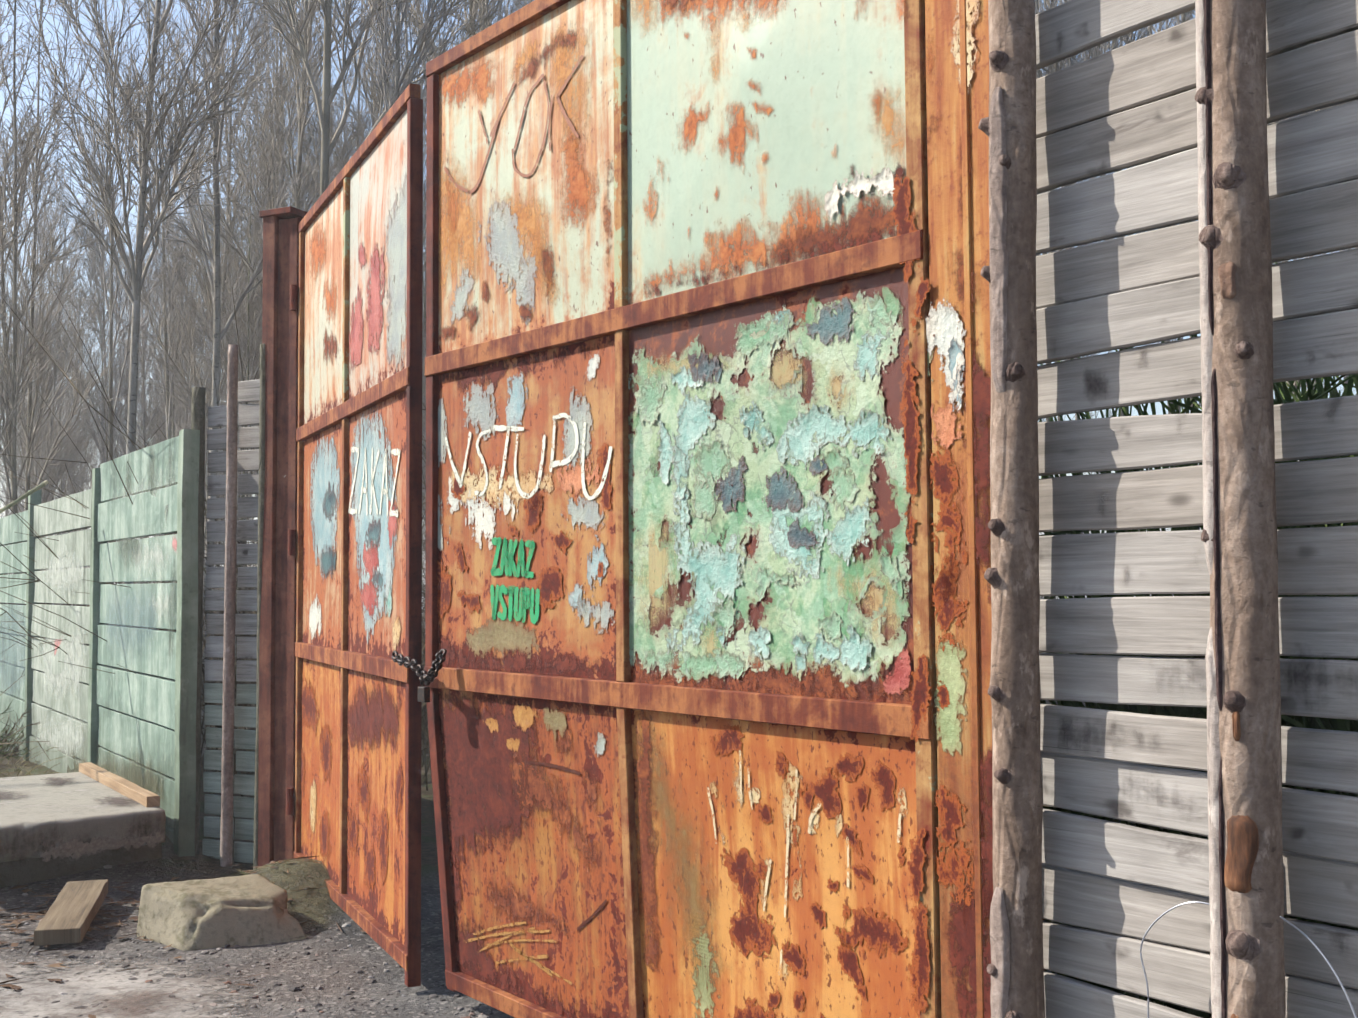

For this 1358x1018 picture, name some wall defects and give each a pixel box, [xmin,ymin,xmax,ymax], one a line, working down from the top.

rust [310,225,339,364]
rust [438,163,489,340]
rust [508,30,613,301]
rust [719,81,773,165]
rust [643,193,898,297]
peeling [824,163,917,236]
peeling [309,409,401,650]
peeling [437,258,969,758]
rust [962,350,991,604]
rust [301,678,404,893]
rust [438,693,609,1018]
rust [942,749,993,1018]